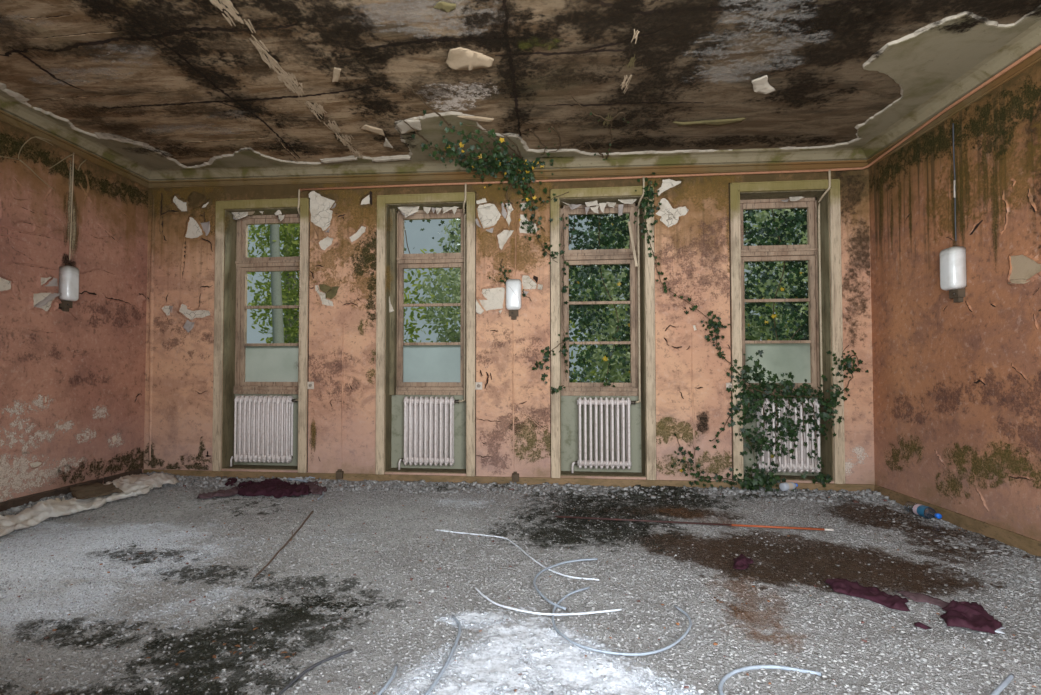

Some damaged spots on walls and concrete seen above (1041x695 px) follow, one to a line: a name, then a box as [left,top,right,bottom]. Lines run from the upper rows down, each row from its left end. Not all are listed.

crack [0,12,297,91]
water stain [0,0,1041,161]
crack [111,86,376,160]
water stain [0,133,228,256]
peeling [171,191,212,241]
peeling [306,190,368,253]
peeling [475,198,540,253]
peeling [654,177,690,230]
water stain [835,76,1041,343]
peeling [476,284,506,314]
water stain [0,394,123,501]
water stain [697,412,709,433]